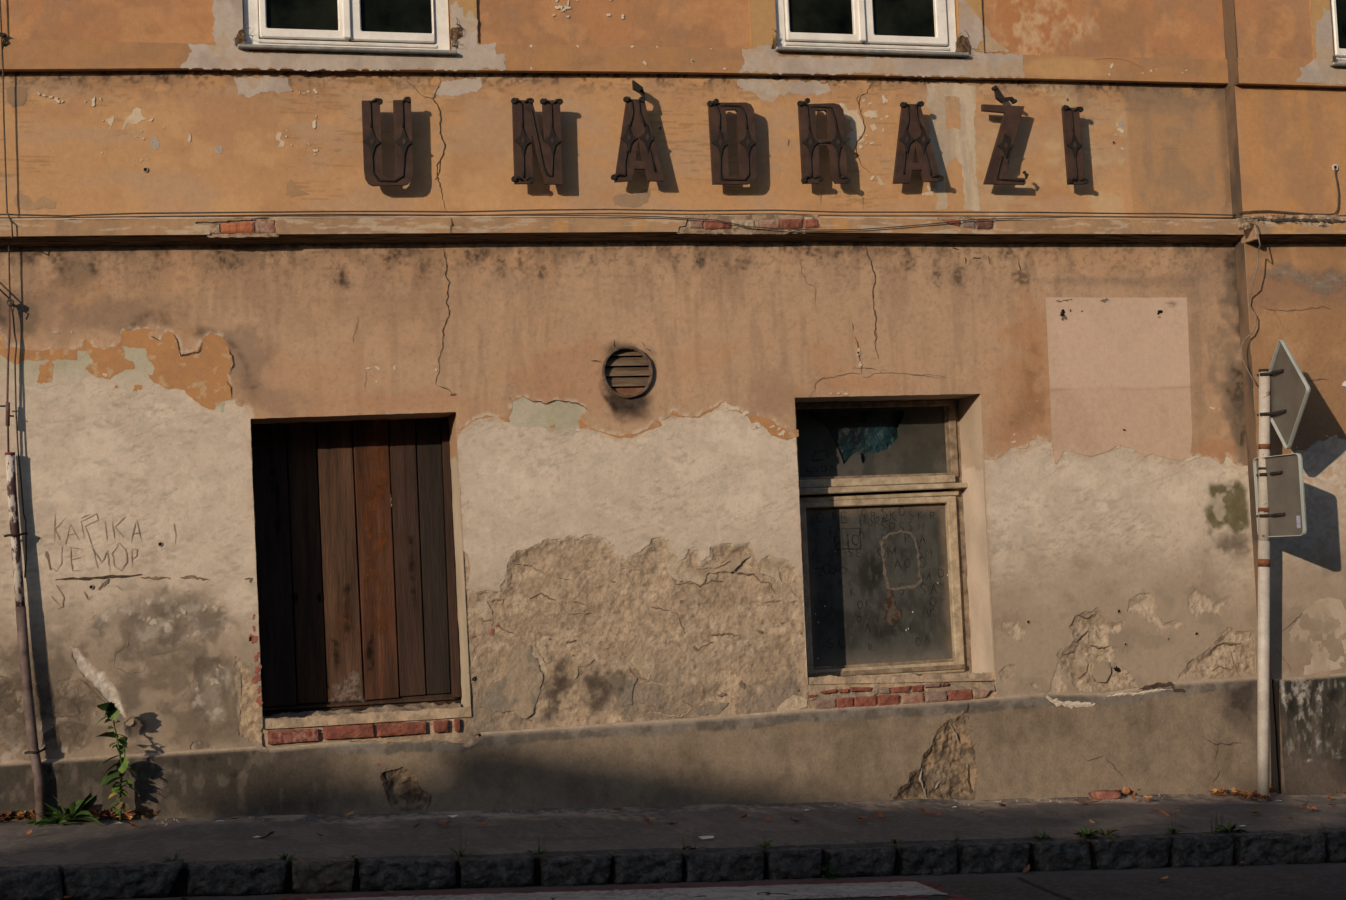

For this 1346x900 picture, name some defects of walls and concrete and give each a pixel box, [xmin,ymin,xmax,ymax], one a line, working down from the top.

spalling [234,23,251,46]
spalling [450,18,463,49]
crack [406,78,456,396]
crack [811,249,947,394]
leakage [1207,482,1248,550]
peeling [0,329,1346,800]
leakage [1281,684,1343,711]
spalling [377,763,432,811]